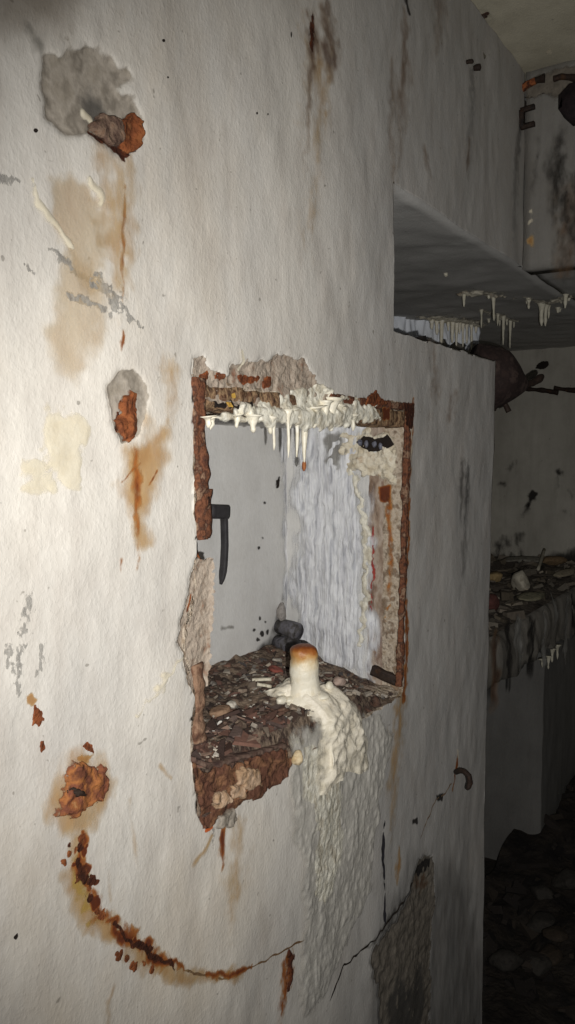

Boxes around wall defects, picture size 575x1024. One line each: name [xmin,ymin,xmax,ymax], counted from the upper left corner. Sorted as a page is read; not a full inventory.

corrosion [309,11,336,75]
spalling [41,46,146,162]
spalling [107,370,149,443]
spalling [193,350,328,409]
corrosion [126,429,168,547]
spalling [155,557,215,696]
leakage [201,383,397,1016]
crack [412,784,451,839]
corrosion [61,826,304,1016]
crack [330,823,413,1000]